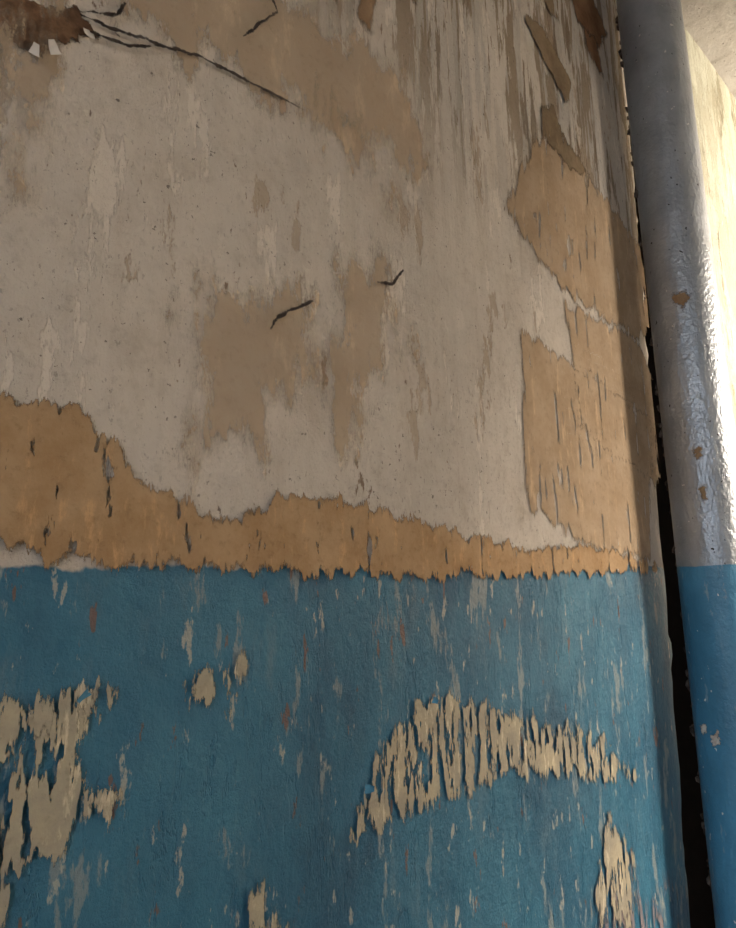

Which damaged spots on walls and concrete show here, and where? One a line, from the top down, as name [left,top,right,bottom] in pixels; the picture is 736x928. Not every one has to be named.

spalling [0,0,99,68]
crack [80,0,303,110]
peeling [525,13,571,103]
peeling [0,104,661,584]